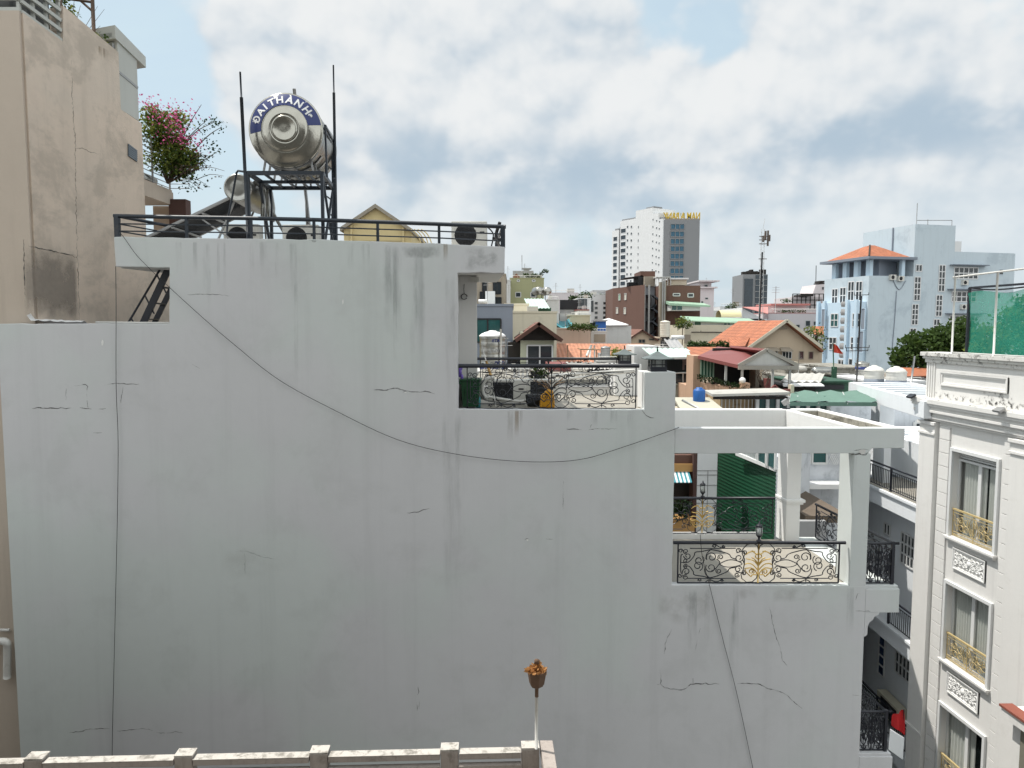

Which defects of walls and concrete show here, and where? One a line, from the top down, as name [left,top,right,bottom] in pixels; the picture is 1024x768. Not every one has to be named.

crack [32,383,137,409]